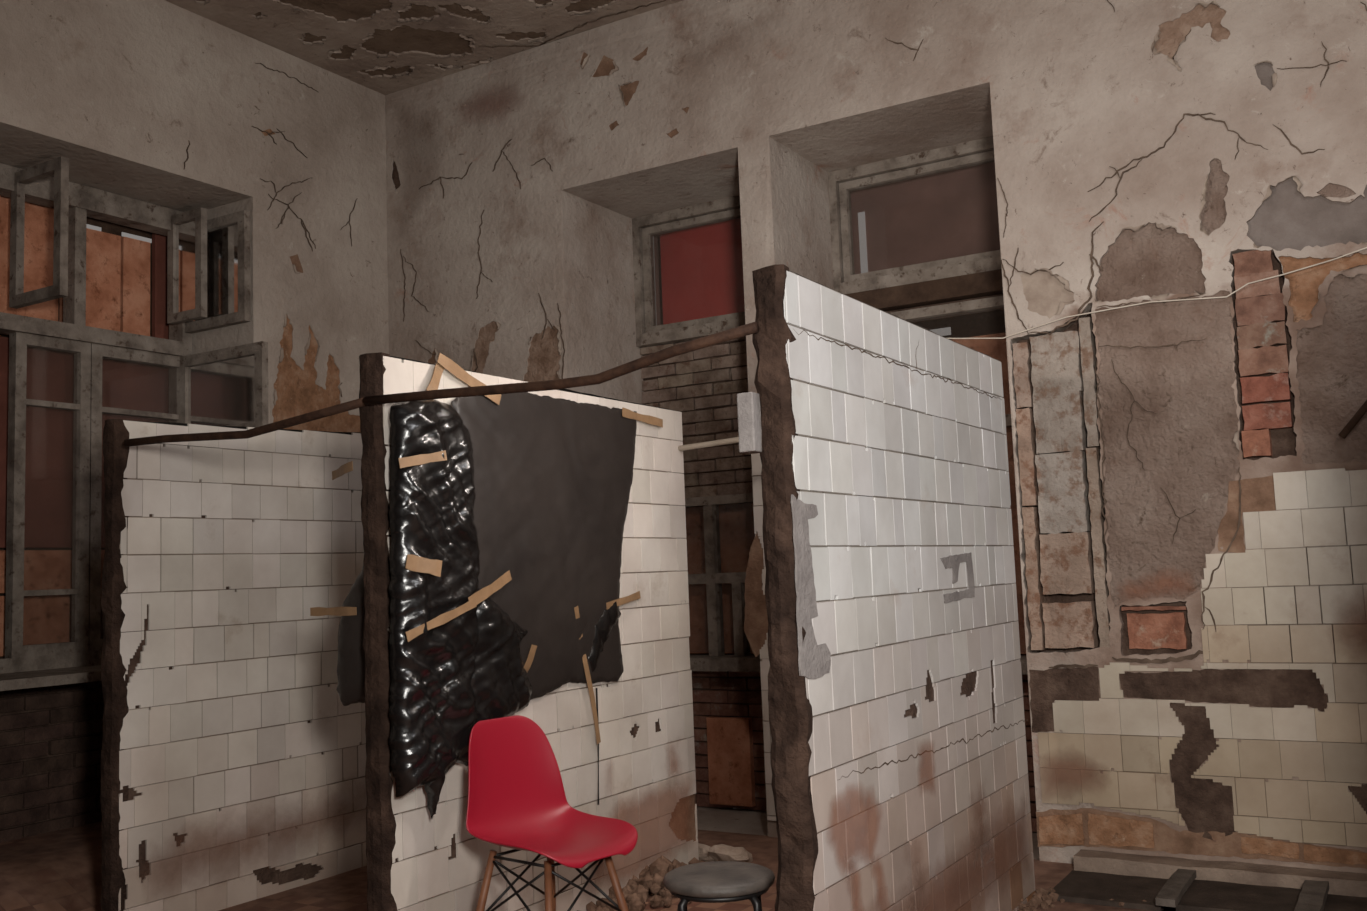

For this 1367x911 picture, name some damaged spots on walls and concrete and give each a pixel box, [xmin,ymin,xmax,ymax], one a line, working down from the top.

peeling [280,0,548,79]
peeling [580,47,648,106]
peeling [1151,0,1230,72]
crack [252,126,358,251]
crack [476,210,492,299]
crack [419,139,552,199]
crack [998,112,1325,335]
crack [1095,339,1204,558]
flaking render [1012,159,1367,732]
spalling [272,314,400,911]
flaking render [1036,669,1367,869]
peeling [252,864,323,885]